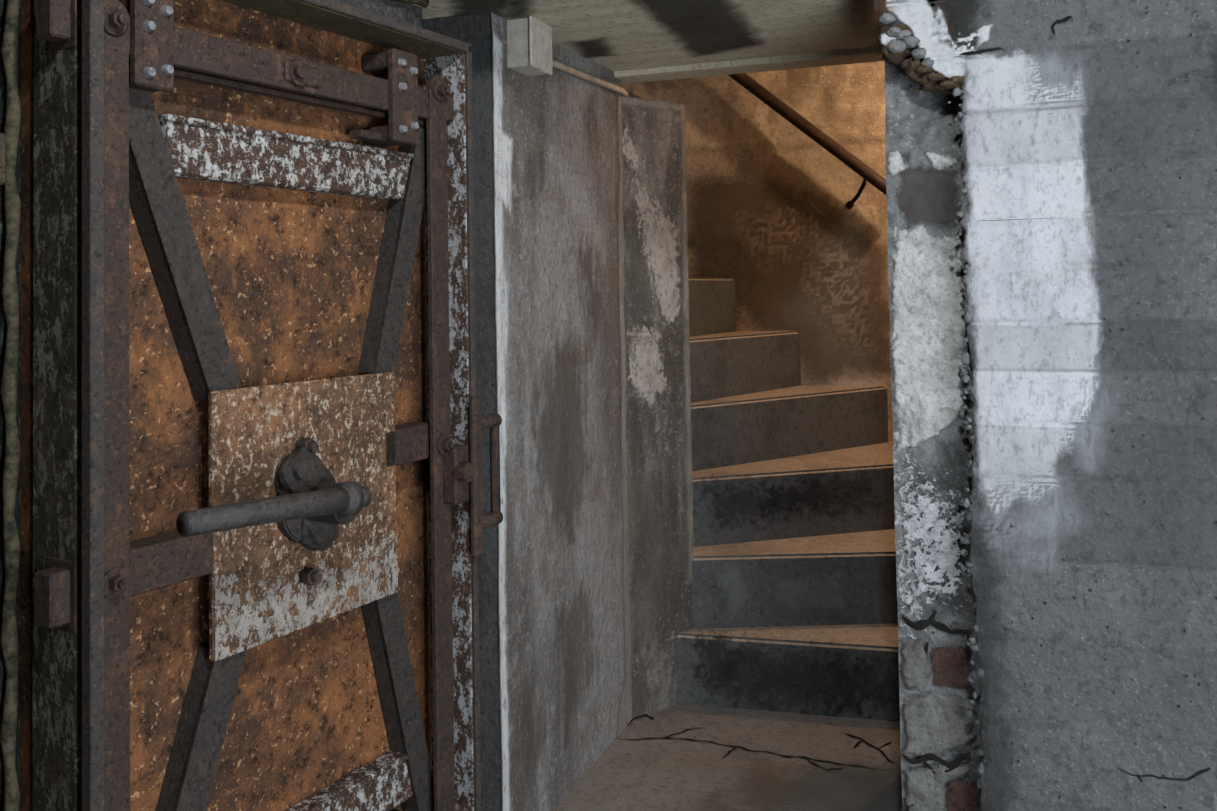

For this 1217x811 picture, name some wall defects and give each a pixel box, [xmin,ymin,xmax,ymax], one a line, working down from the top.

peeling [876,0,992,132]
spalling [887,151,987,811]
crack [614,713,971,774]
crack [1118,768,1211,782]